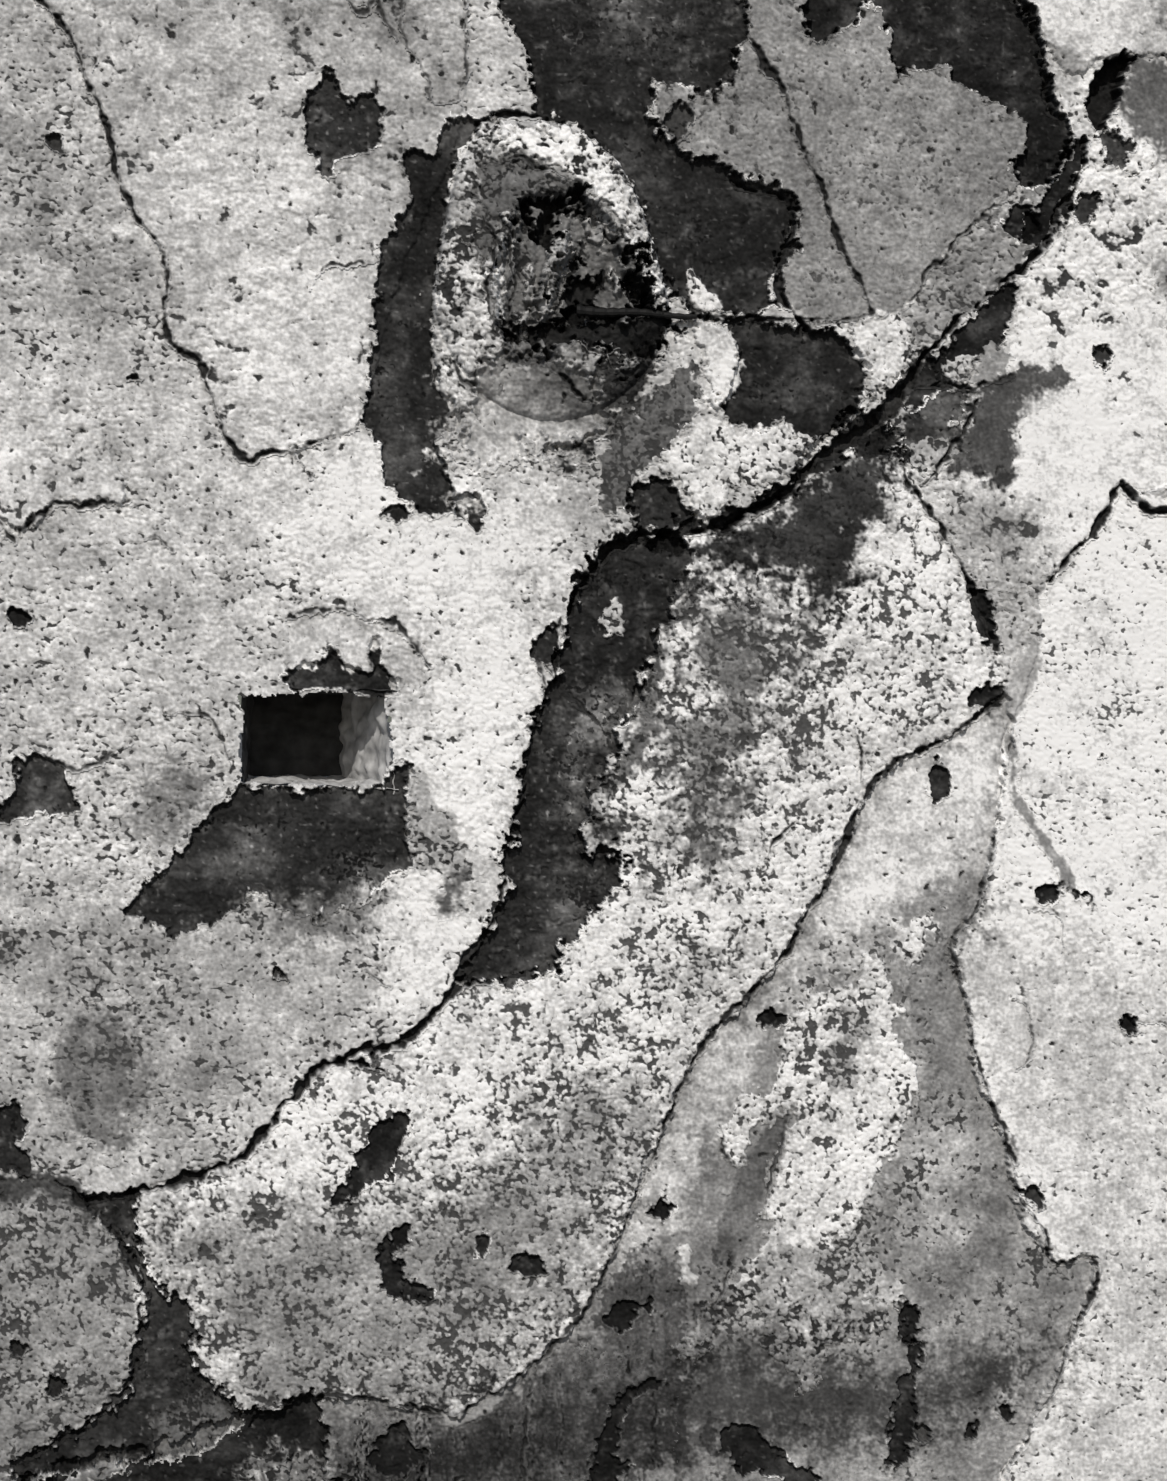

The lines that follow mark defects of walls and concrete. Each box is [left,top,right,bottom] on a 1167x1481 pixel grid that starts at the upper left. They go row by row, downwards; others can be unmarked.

crack [35,0,360,481]
flaking render [301,65,387,180]
flaking render [358,111,490,534]
flaking render [468,0,1155,993]
crack [566,137,1091,653]
crack [1048,478,1167,584]
flaking render [4,1186,354,1481]
flaking render [123,758,423,942]
crack [0,624,615,1481]
crack [239,697,1102,1481]
water stain [304,1025,1098,1481]
flaking render [561,636,1101,1481]